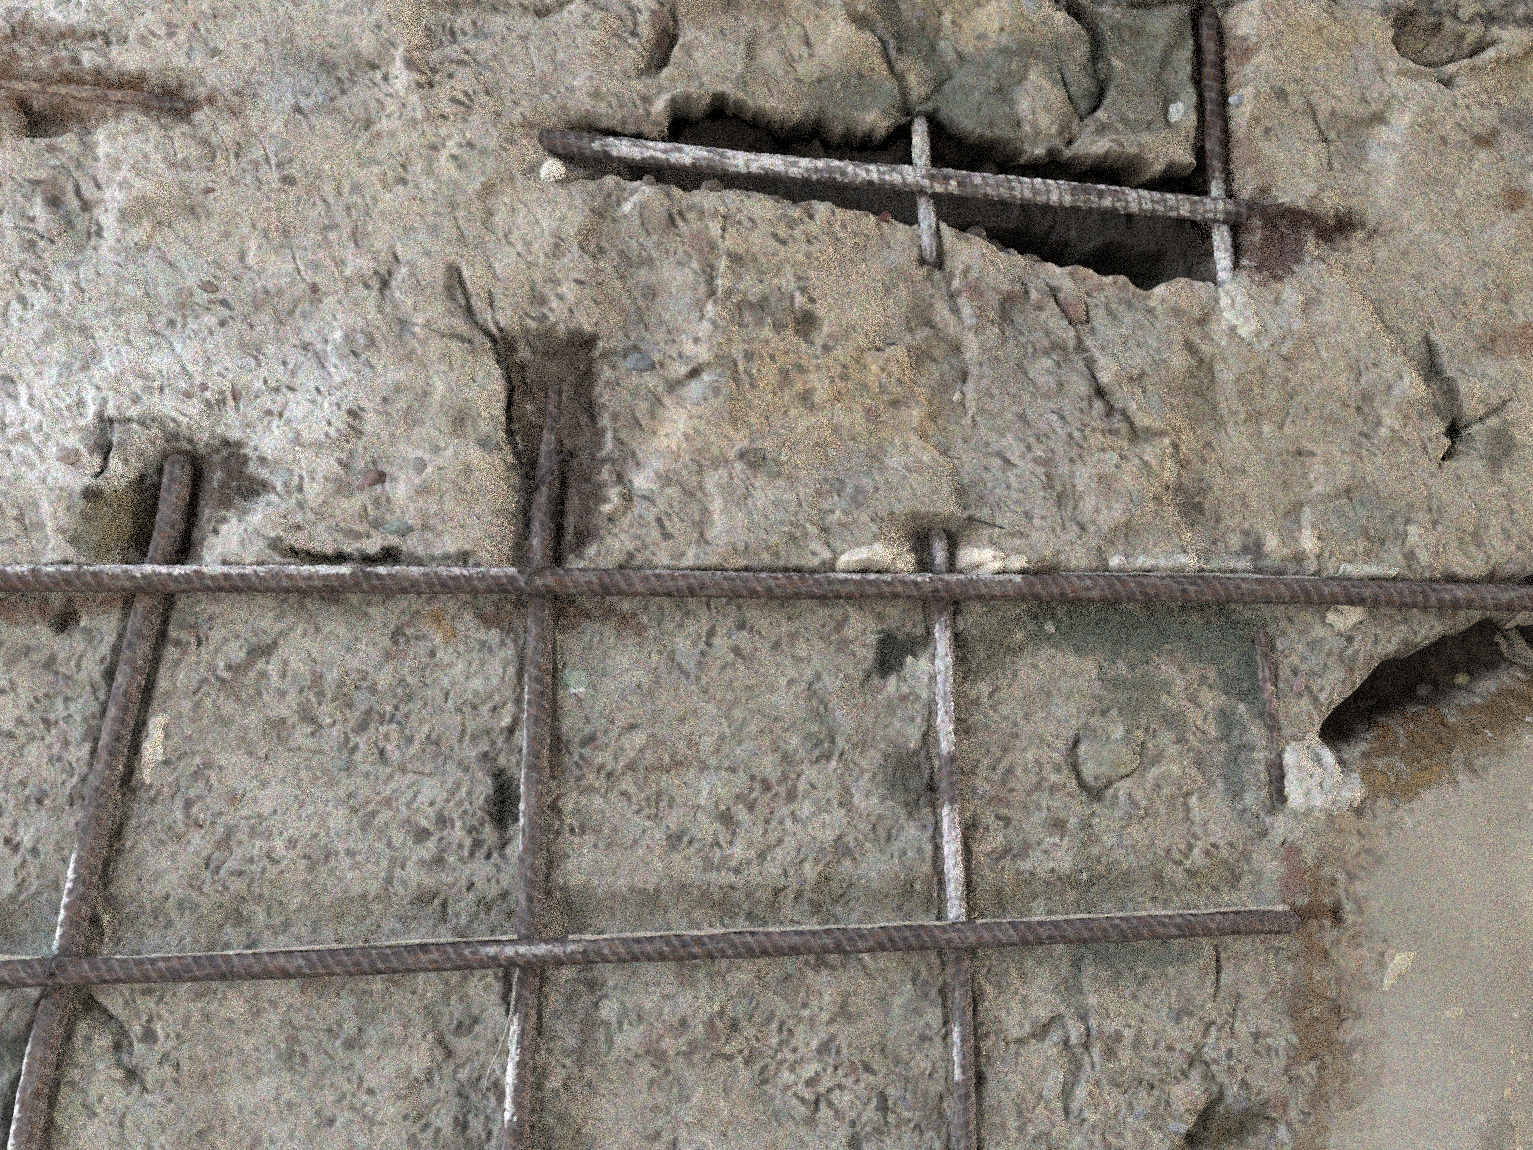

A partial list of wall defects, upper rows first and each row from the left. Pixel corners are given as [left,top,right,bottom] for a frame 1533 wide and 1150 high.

rust [0,21,233,134]
spalling [0,0,1533,586]
rust [95,432,265,562]
spalling [0,558,1533,1150]
rust [1281,848,1348,1150]
rust [1360,668,1533,797]